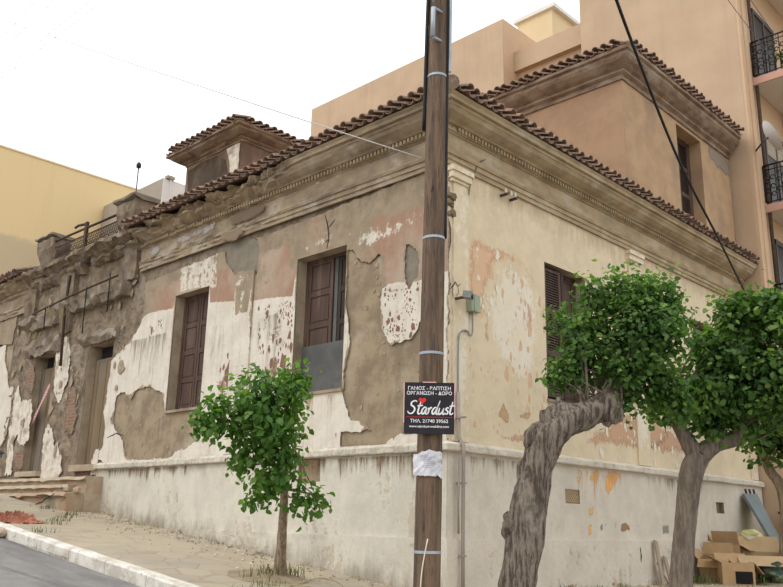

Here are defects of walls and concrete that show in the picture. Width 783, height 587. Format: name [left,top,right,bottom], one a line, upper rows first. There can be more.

peeling [177,222,215,242]
spalling [220,228,260,275]
spalling [0,271,162,478]
peeling [258,301,293,384]
spalling [341,245,420,447]
peeling [470,242,546,421]
spalling [110,385,202,460]
peeling [495,405,524,442]